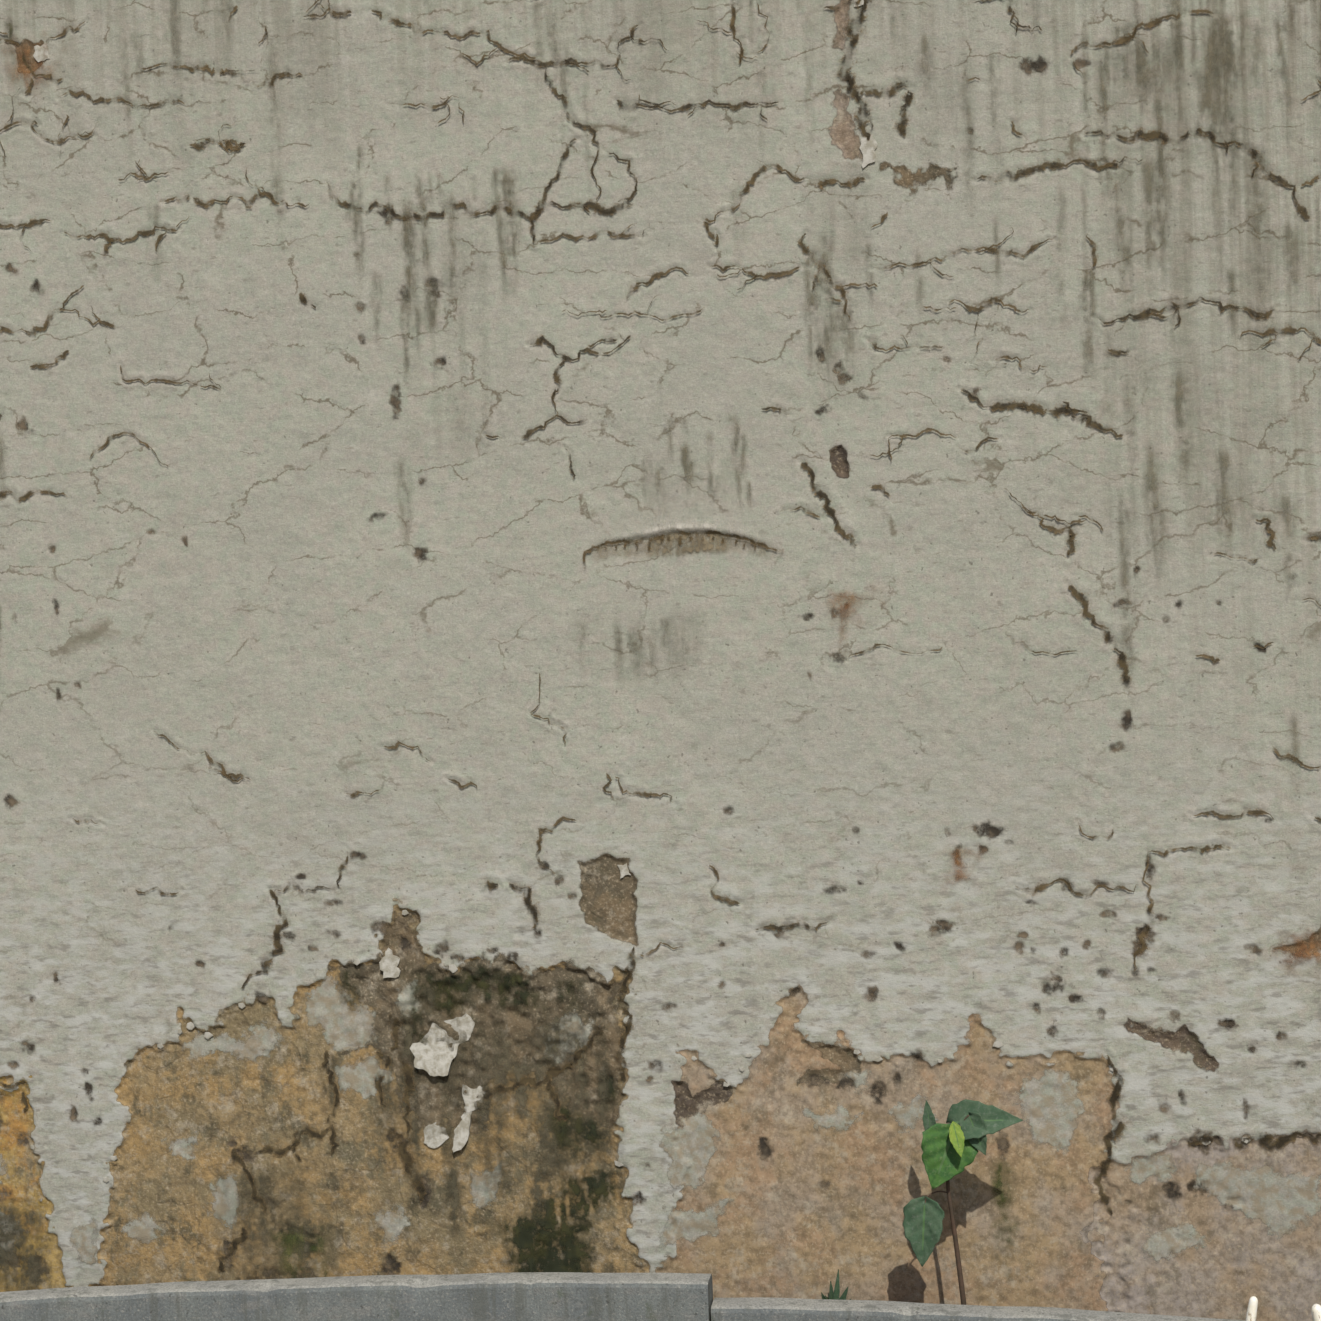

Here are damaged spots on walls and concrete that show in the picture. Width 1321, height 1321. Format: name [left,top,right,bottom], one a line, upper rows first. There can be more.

crack [0,0,778,252]
spalling [832,0,864,49]
crack [824,0,914,140]
crack [977,128,1319,219]
damp [1146,149,1165,243]
crack [486,164,1123,496]
damp [682,447,692,478]
crack [1009,492,1131,684]
crack [241,856,348,989]
spalling [539,854,639,946]
crack [1016,809,1275,971]
peeling [0,898,1321,1321]